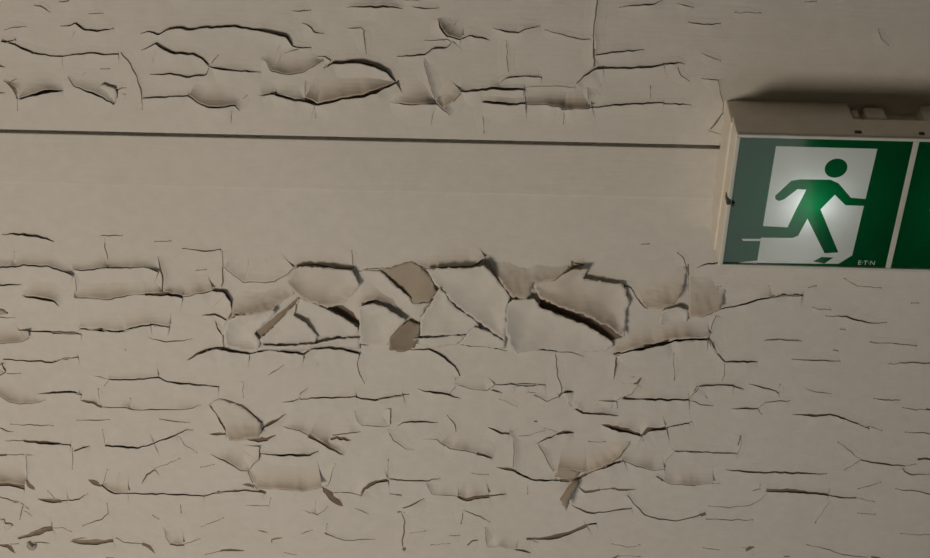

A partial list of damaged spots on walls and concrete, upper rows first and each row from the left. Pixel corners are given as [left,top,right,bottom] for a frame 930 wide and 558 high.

peeling [2,71,126,117]
peeling [142,17,664,134]
peeling [0,245,804,558]
crack [382,344,624,455]
crack [514,277,930,558]